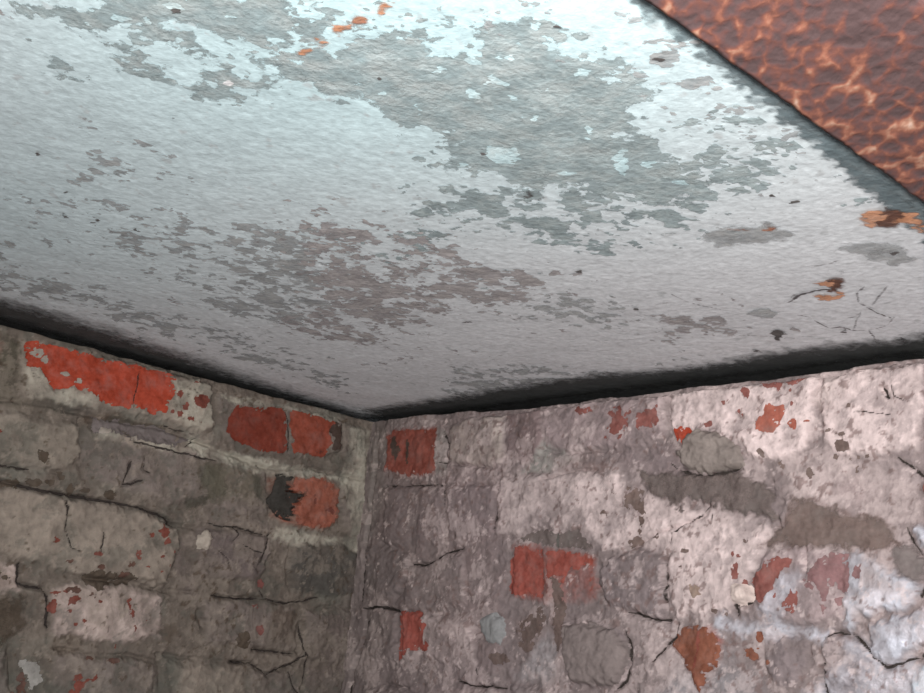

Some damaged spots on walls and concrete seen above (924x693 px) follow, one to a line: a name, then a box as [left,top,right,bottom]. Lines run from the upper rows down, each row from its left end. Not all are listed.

peeling [0,0,806,396]
corrosion [860,210,924,233]
corrosion [814,278,845,301]
peeling [24,341,210,423]
spalling [226,405,342,458]
peeling [755,378,810,433]
crack [0,426,215,551]
crack [15,563,48,628]
crack [362,565,401,626]
peeling [509,529,593,653]
crack [230,626,308,693]
crack [828,631,924,669]